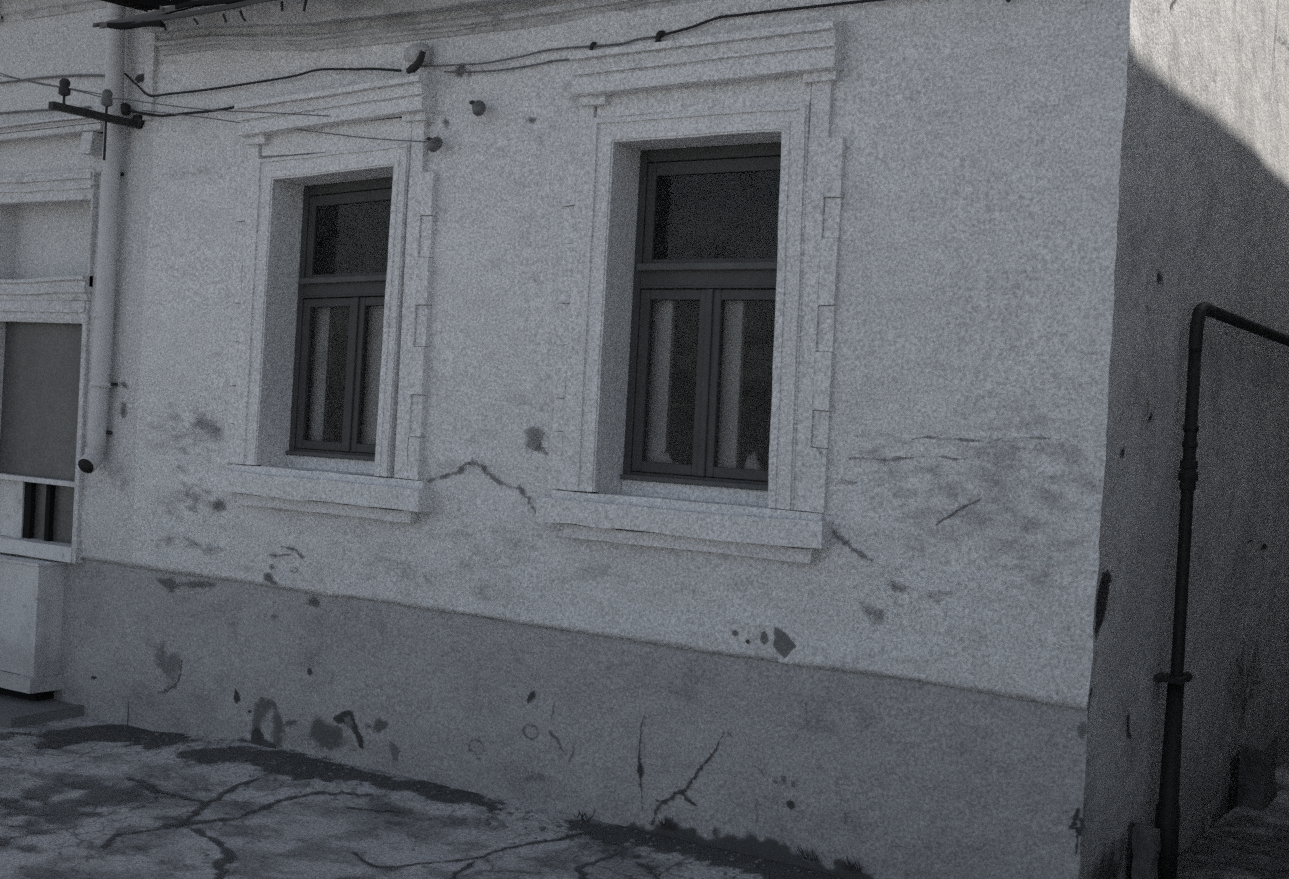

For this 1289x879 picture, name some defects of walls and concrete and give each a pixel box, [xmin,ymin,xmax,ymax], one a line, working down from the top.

crack [427,459,536,513]
crack [849,436,977,484]
crack [936,499,980,525]
crack [832,530,873,561]
spalling [1095,569,1112,638]
peeling [732,624,802,664]
spalling [332,707,404,766]
crack [549,705,574,762]
crack [637,715,731,825]
crack [102,777,401,879]
crack [352,830,660,879]